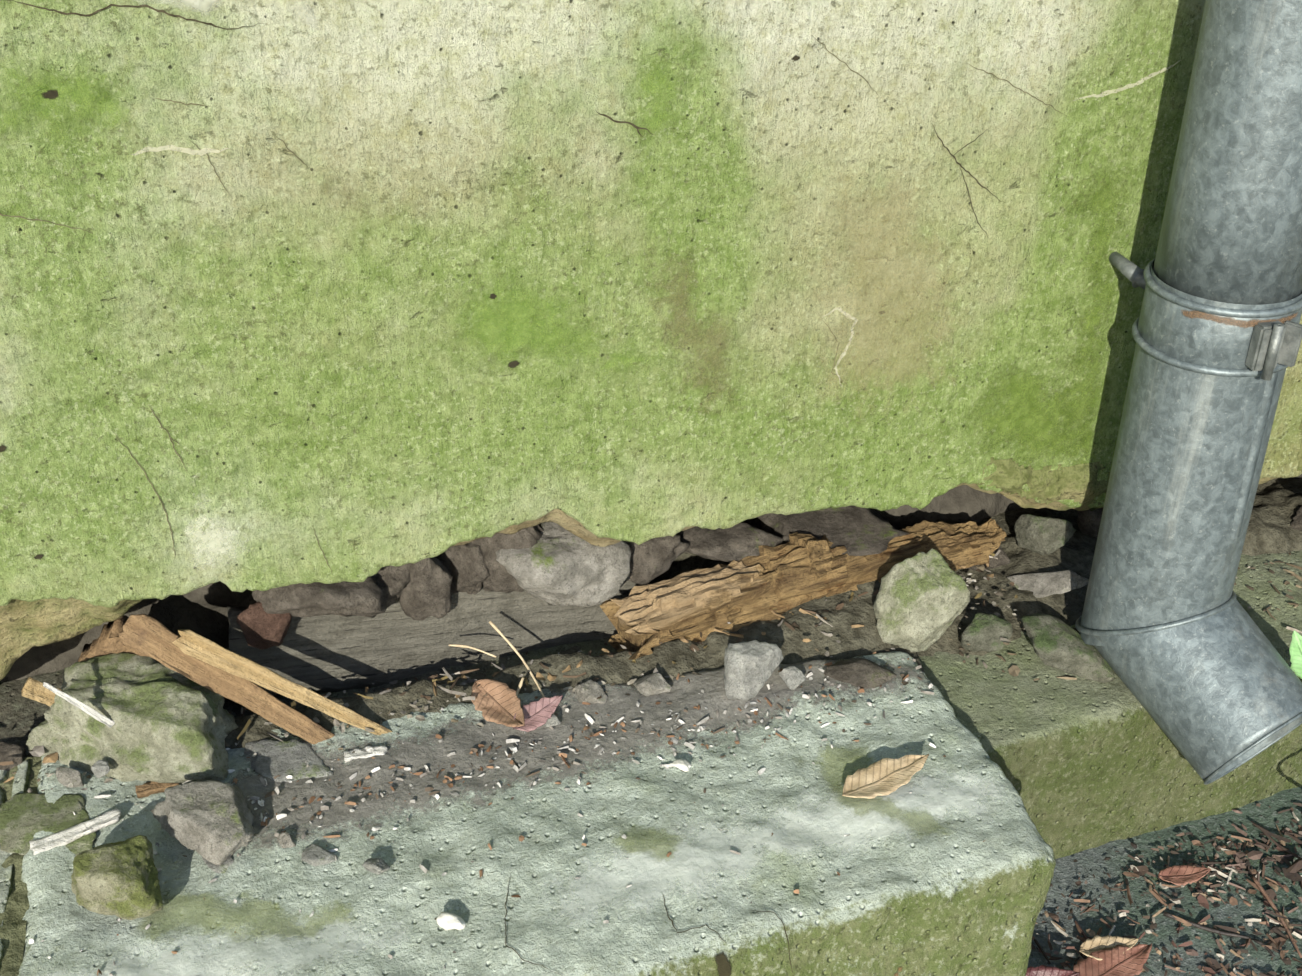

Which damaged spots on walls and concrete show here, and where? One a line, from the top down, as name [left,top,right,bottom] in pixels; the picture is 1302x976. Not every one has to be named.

crack [10,0,264,30]
corrosion [1181,310,1298,328]
crack [505,874,561,975]
crack [662,893,725,942]
crack [750,910,793,973]